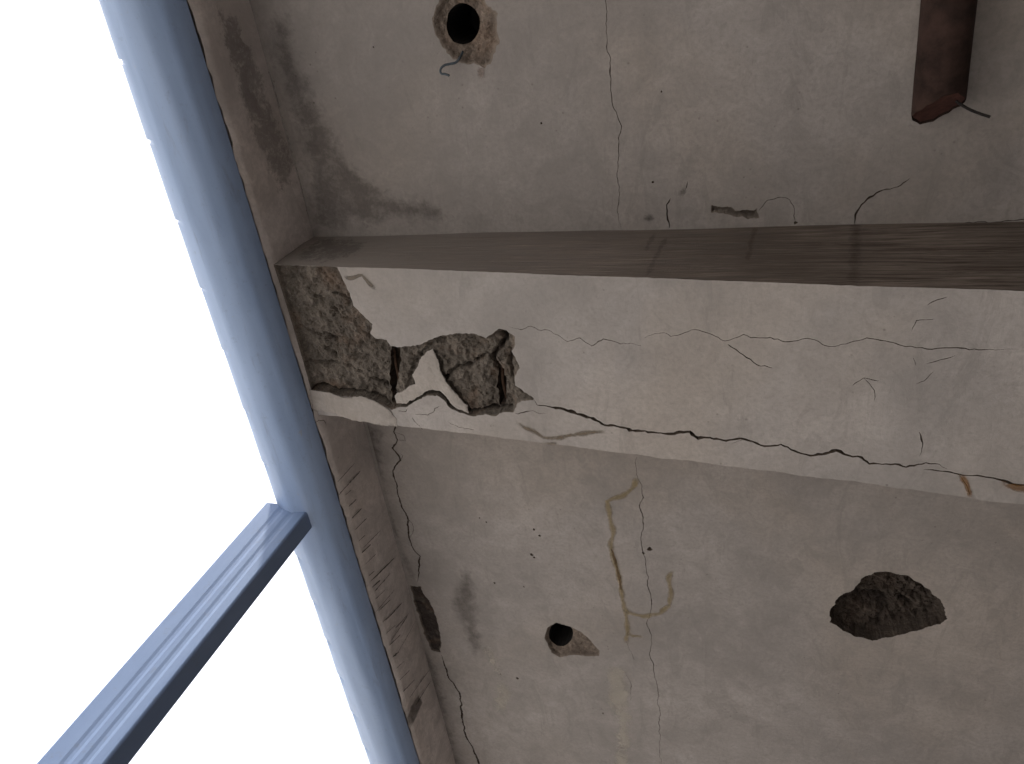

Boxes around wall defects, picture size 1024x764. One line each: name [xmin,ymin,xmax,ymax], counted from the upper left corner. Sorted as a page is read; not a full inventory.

crack [605,0,622,220]
flaking render [711,205,759,219]
crack [854,179,909,224]
spalling [274,265,534,416]
crack [515,297,1004,384]
crack [392,407,472,582]
crack [516,399,1024,486]
peeling [410,586,441,652]
leakage [606,481,672,640]
crack [626,458,662,762]
crack [441,655,480,764]